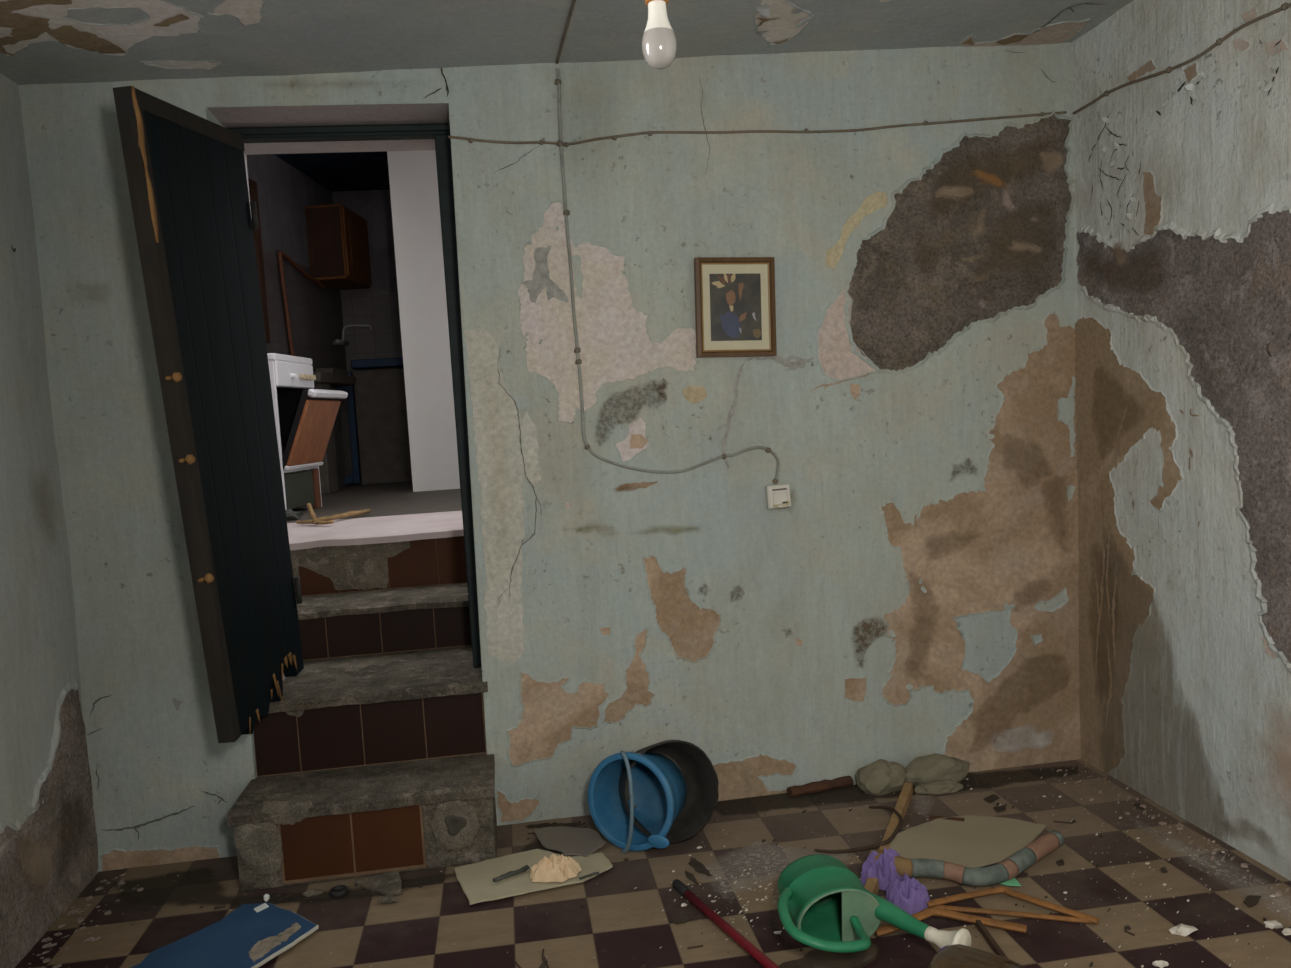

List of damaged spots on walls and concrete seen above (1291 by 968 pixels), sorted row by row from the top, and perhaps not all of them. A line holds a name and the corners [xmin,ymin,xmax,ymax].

peeling [0,0,266,70]
peeling [752,0,816,46]
peeling [516,201,707,424]
crack [498,349,542,605]
peeling [614,417,650,462]
flaking render [815,110,1291,773]
flaking render [505,553,722,767]
flaking render [0,682,221,968]
flaking render [712,752,811,801]